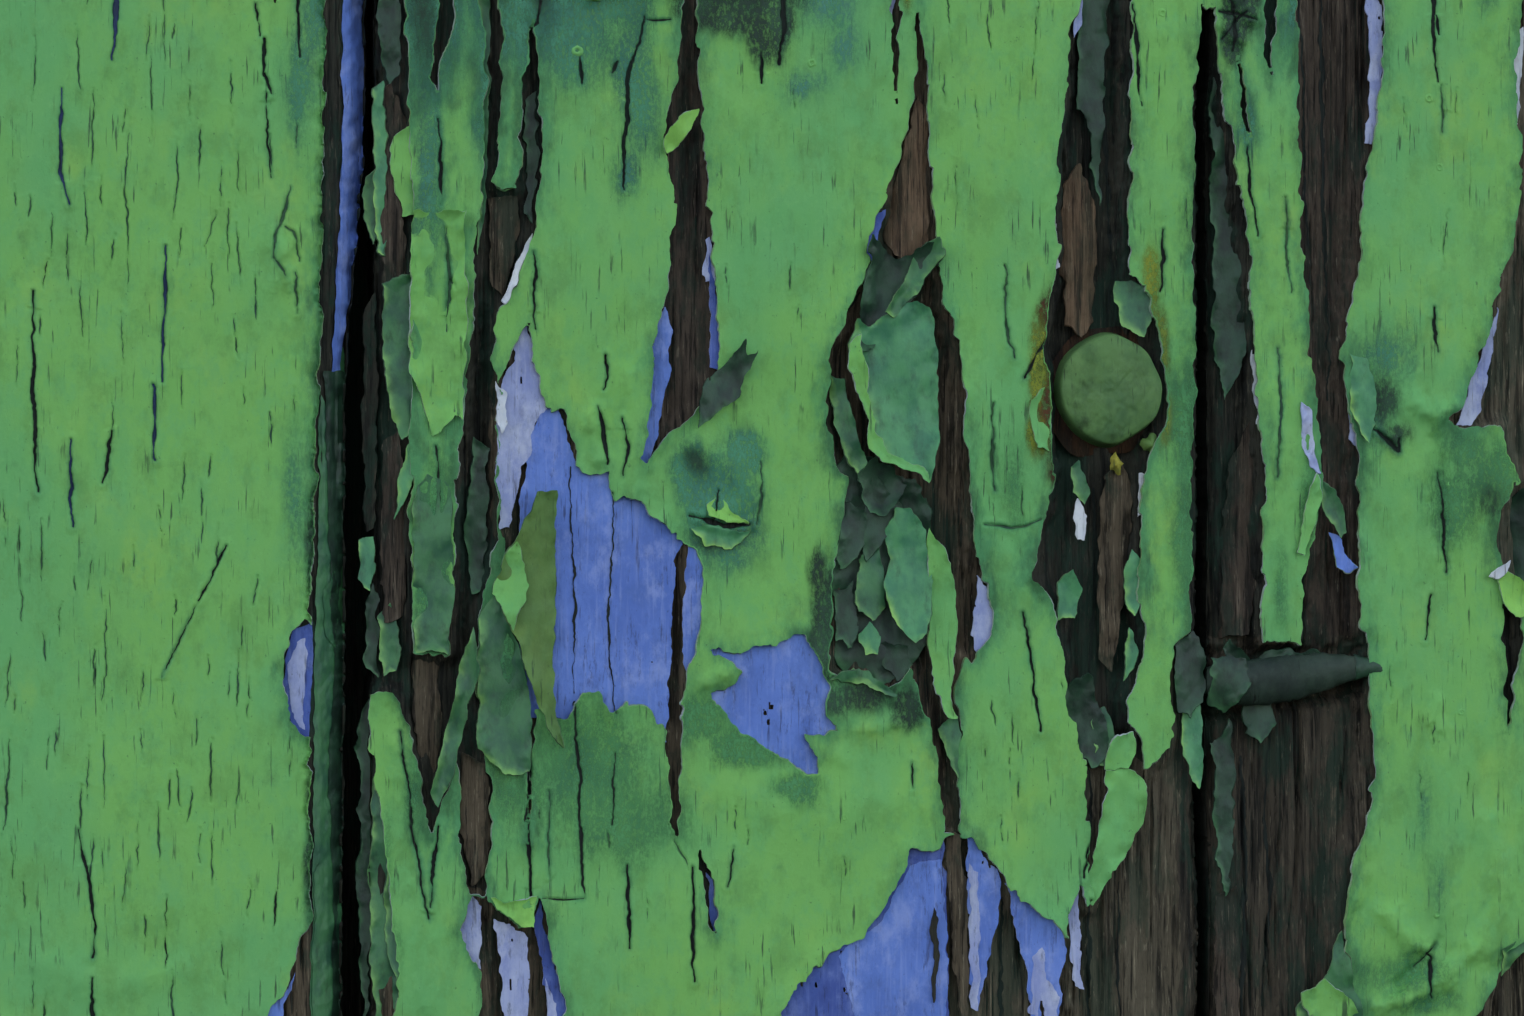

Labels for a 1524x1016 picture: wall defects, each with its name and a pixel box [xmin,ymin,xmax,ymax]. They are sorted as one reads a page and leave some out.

crack [1406,0,1457,133]
crack [3,0,301,1016]
peeling [342,0,1385,1016]
crack [1372,429,1401,453]
crack [1431,307,1439,352]
crack [1425,473,1447,640]
peeling [1449,0,1524,725]
peeling [1476,941,1524,1016]